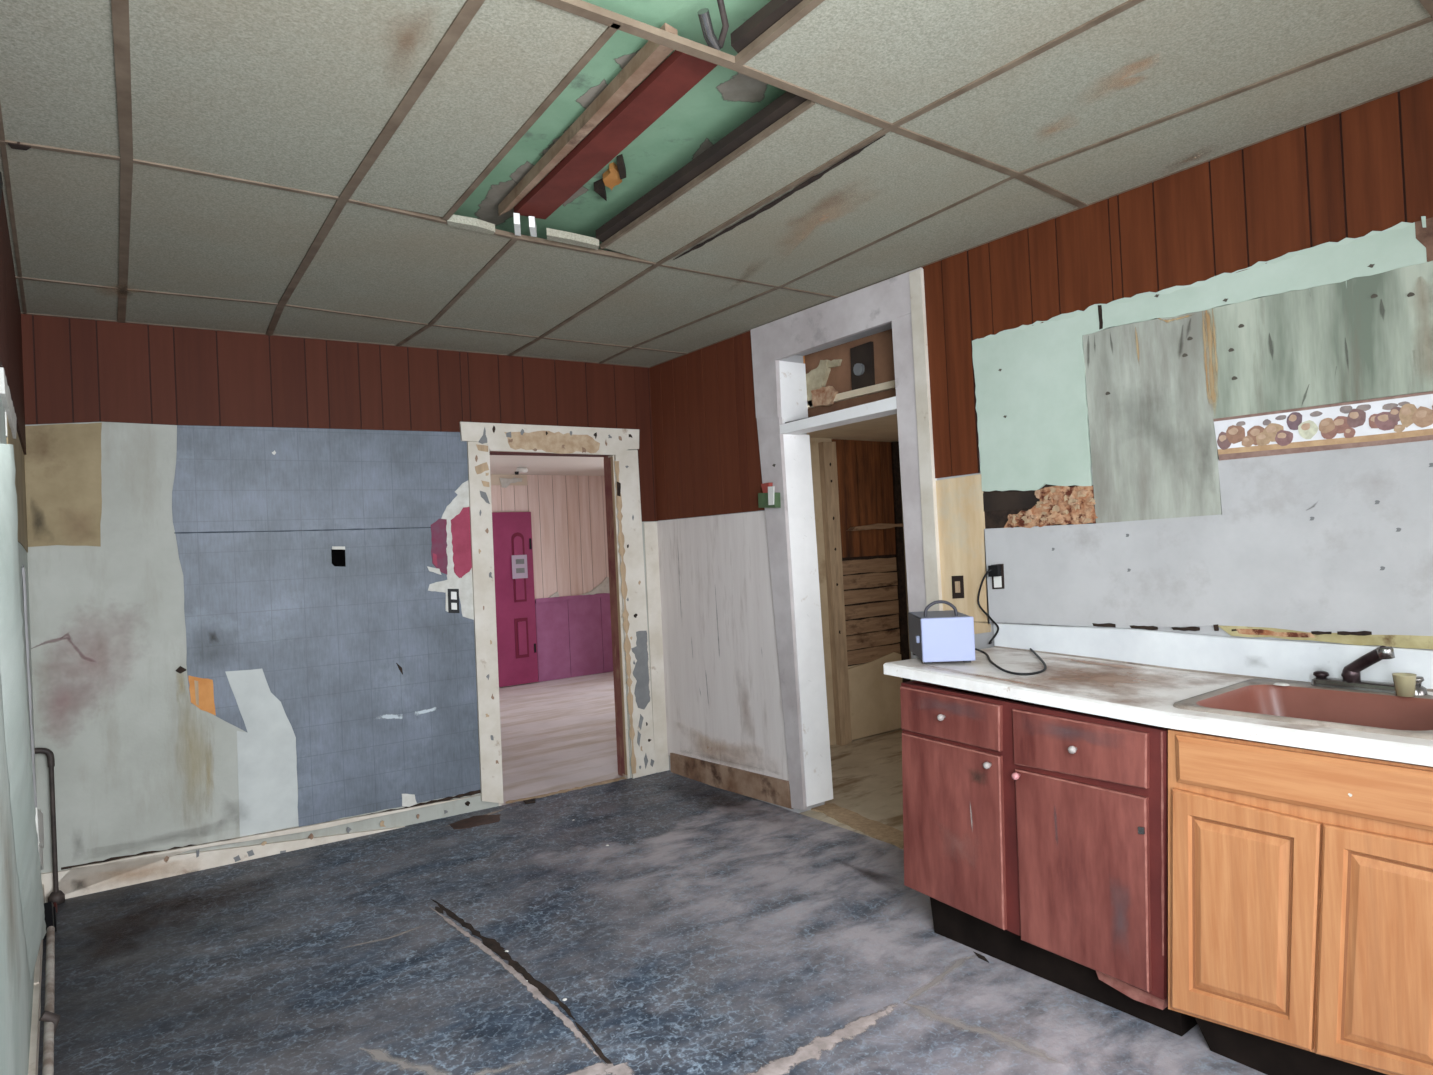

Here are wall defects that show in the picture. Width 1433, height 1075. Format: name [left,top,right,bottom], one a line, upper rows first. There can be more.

peeling [716,72,767,103]
spalling [447,88,636,250]
flaking render [1415,216,1433,262]
spalling [983,484,1098,529]
spalling [331,546,346,567]
peeling [402,794,419,819]
peeling [35,808,44,870]
crack [429,899,611,1064]